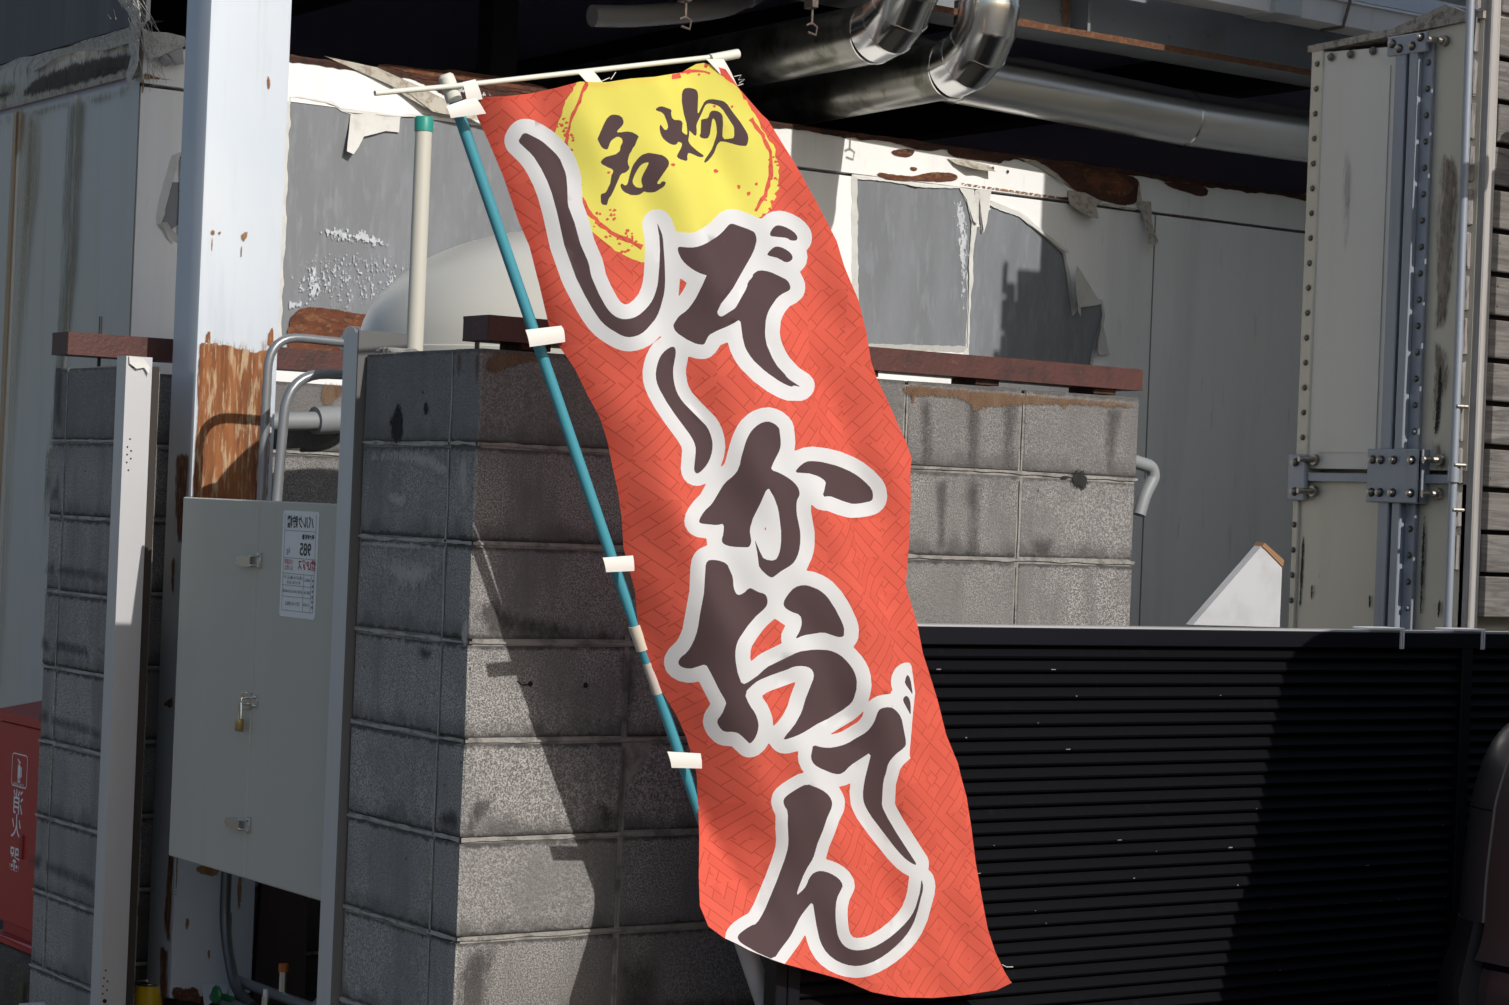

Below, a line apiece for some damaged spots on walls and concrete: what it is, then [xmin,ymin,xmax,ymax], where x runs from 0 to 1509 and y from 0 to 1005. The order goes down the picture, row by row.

leakage [0,52,131,97]
corrosion [0,109,23,491]
peeling [156,152,181,244]
peeling [278,96,523,348]
peeling [851,174,1110,365]
corrosion [769,121,1307,245]
corrosion [171,307,366,592]
corrosion [160,837,238,1005]